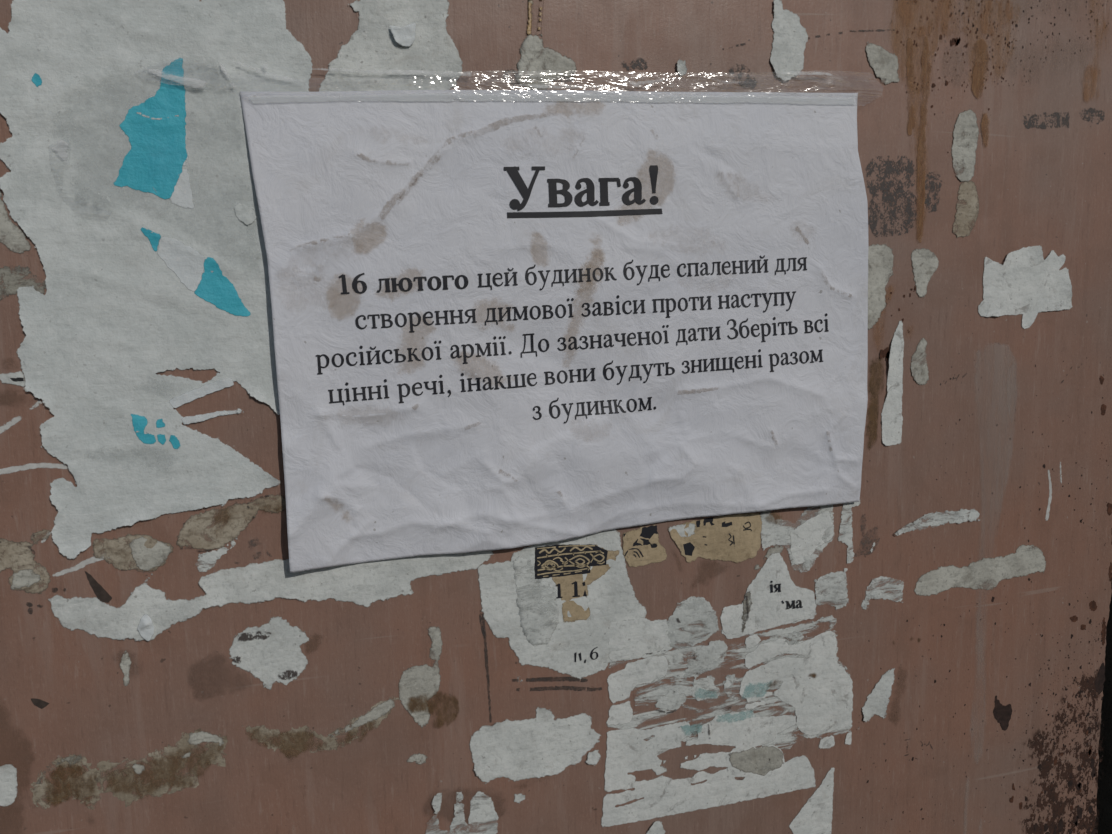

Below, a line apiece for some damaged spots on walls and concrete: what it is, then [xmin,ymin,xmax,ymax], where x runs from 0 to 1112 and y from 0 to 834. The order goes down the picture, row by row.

corrosion [892,0,999,242]
corrosion [993,588,1107,834]